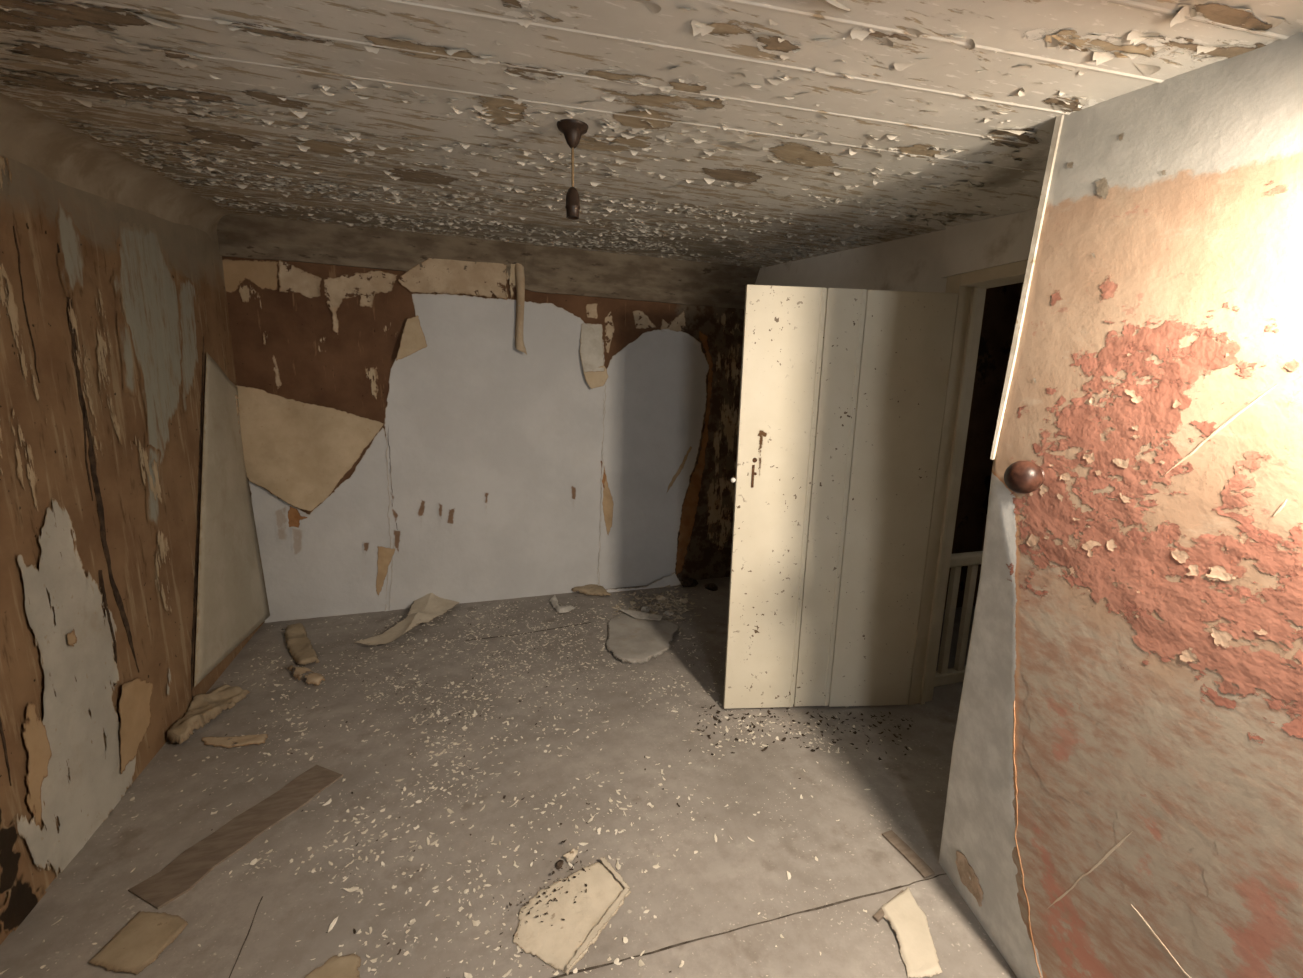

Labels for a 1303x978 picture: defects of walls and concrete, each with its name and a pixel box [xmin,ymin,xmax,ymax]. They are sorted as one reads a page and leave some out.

peeling [0,0,1046,267]
peeling [976,50,1099,113]
peeling [1017,0,1283,76]
peeling [1262,181,1289,197]
peeling [675,331,713,576]
peeling [1006,277,1303,738]
mould [0,805,46,934]